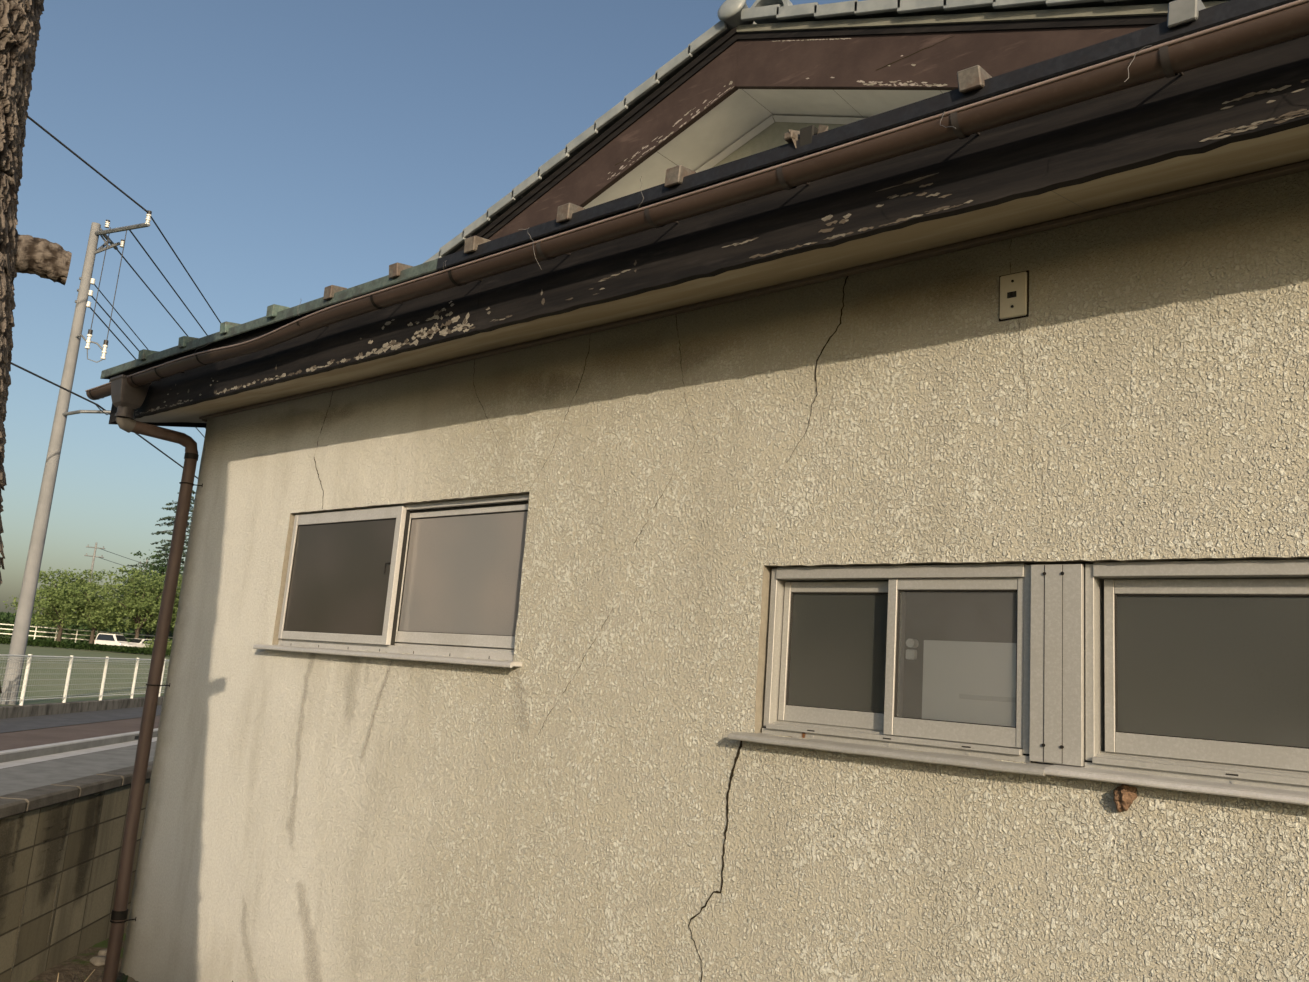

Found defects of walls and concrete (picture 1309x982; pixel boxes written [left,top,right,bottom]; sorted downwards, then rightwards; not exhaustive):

peeling [1199,79,1309,142]
peeling [135,301,475,415]
crack [786,276,848,463]
crack [688,741,742,982]